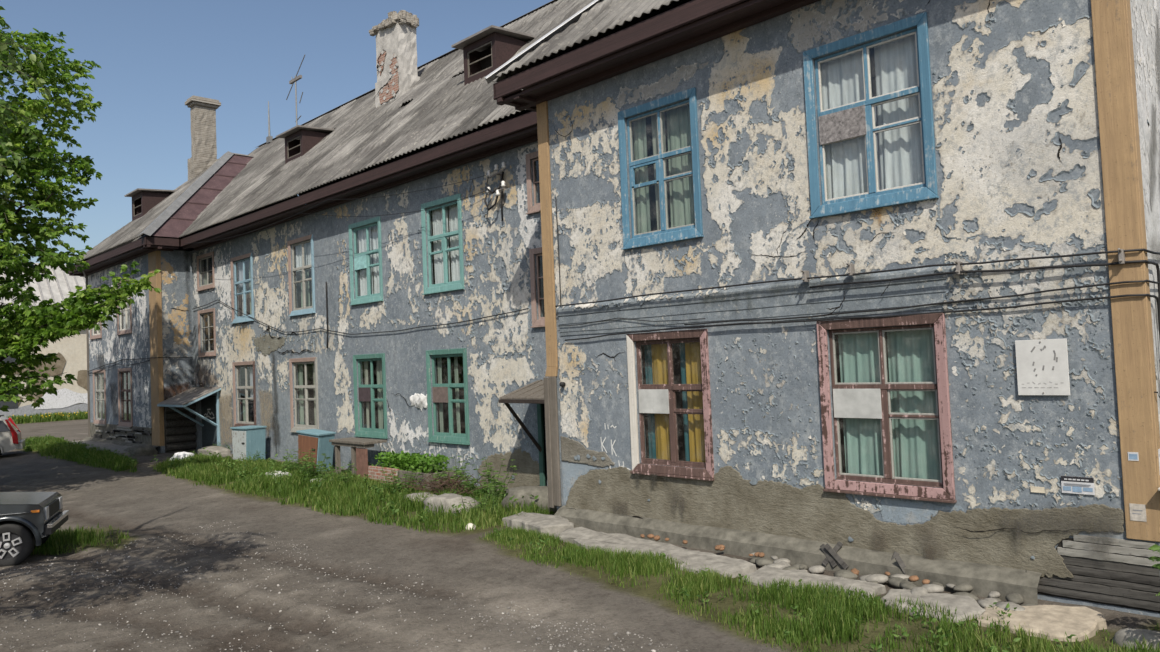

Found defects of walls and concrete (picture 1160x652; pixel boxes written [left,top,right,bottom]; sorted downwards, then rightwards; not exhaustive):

peeling [161,0,1125,578]